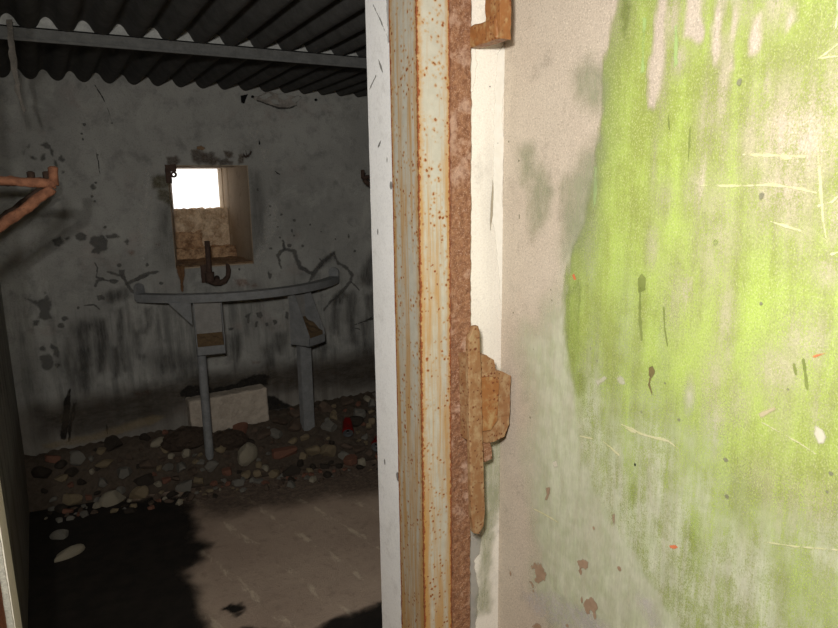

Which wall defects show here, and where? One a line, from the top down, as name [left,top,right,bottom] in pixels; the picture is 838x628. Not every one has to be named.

damp [31,297,51,325]
crack [84,263,158,310]
crack [276,240,360,311]
damp [638,275,646,341]
damp [312,343,376,386]
damp [793,359,808,390]
damp [44,375,248,430]